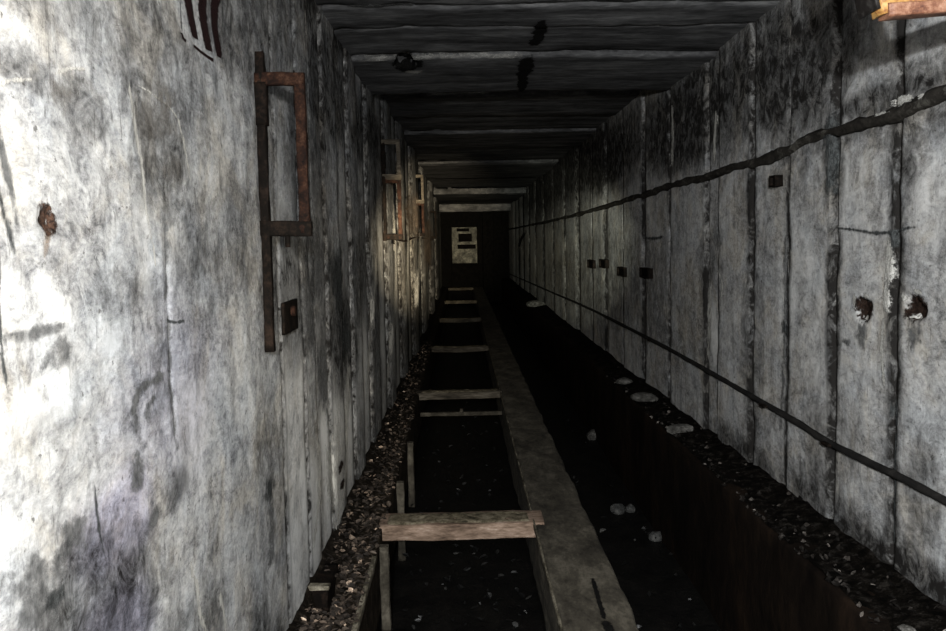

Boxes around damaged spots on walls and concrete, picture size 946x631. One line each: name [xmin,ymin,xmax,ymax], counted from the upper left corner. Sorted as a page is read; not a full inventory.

leakage [0,139,18,254]
corrosion [38,201,58,252]
leakage [129,82,190,221]
peeling [779,235,789,429]
peeling [844,236,928,386]
leakage [13,517,84,631]
leakage [132,450,143,491]
leakage [149,506,159,528]